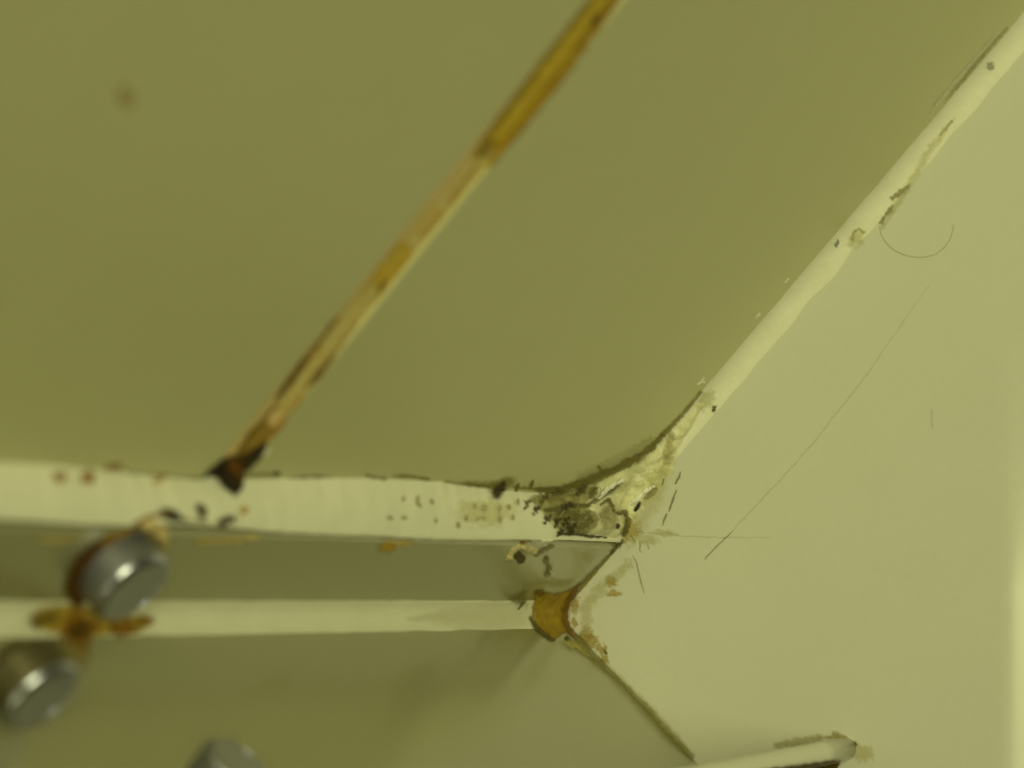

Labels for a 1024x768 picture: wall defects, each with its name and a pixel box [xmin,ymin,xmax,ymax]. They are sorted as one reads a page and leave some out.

water stain [366,473,430,481]
water stain [457,480,641,538]
spalling [505,538,555,577]
corrosion [0,527,153,664]
corrosion [511,584,608,662]